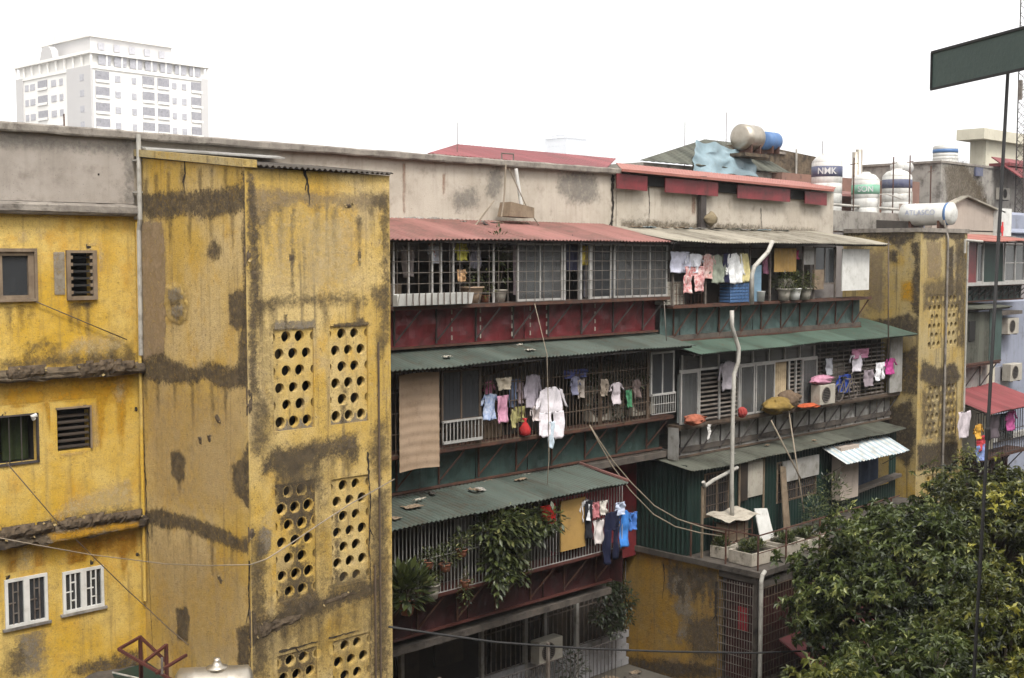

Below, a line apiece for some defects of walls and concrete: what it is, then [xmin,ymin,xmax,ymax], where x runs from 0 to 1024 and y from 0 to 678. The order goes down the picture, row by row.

crack [302,170,310,206]
damp [559,173,597,202]
damp [844,232,965,347]
damp [1,171,391,676]
damp [628,564,718,678]